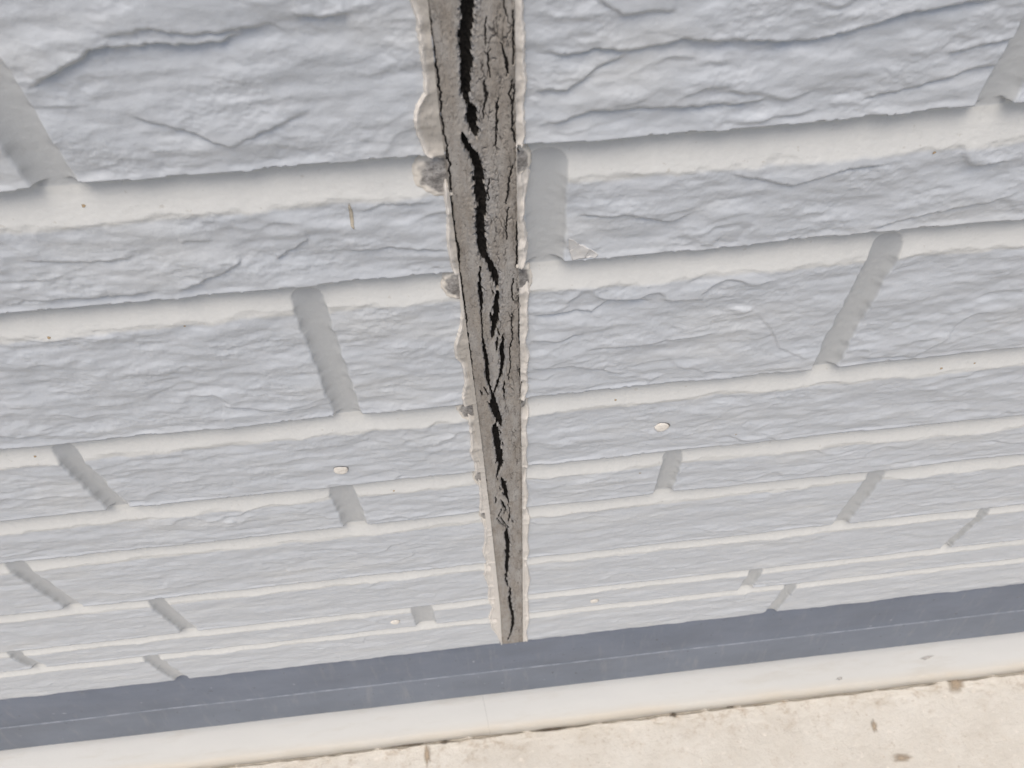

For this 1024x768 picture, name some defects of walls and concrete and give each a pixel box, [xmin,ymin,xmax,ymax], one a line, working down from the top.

crack [428,0,522,639]